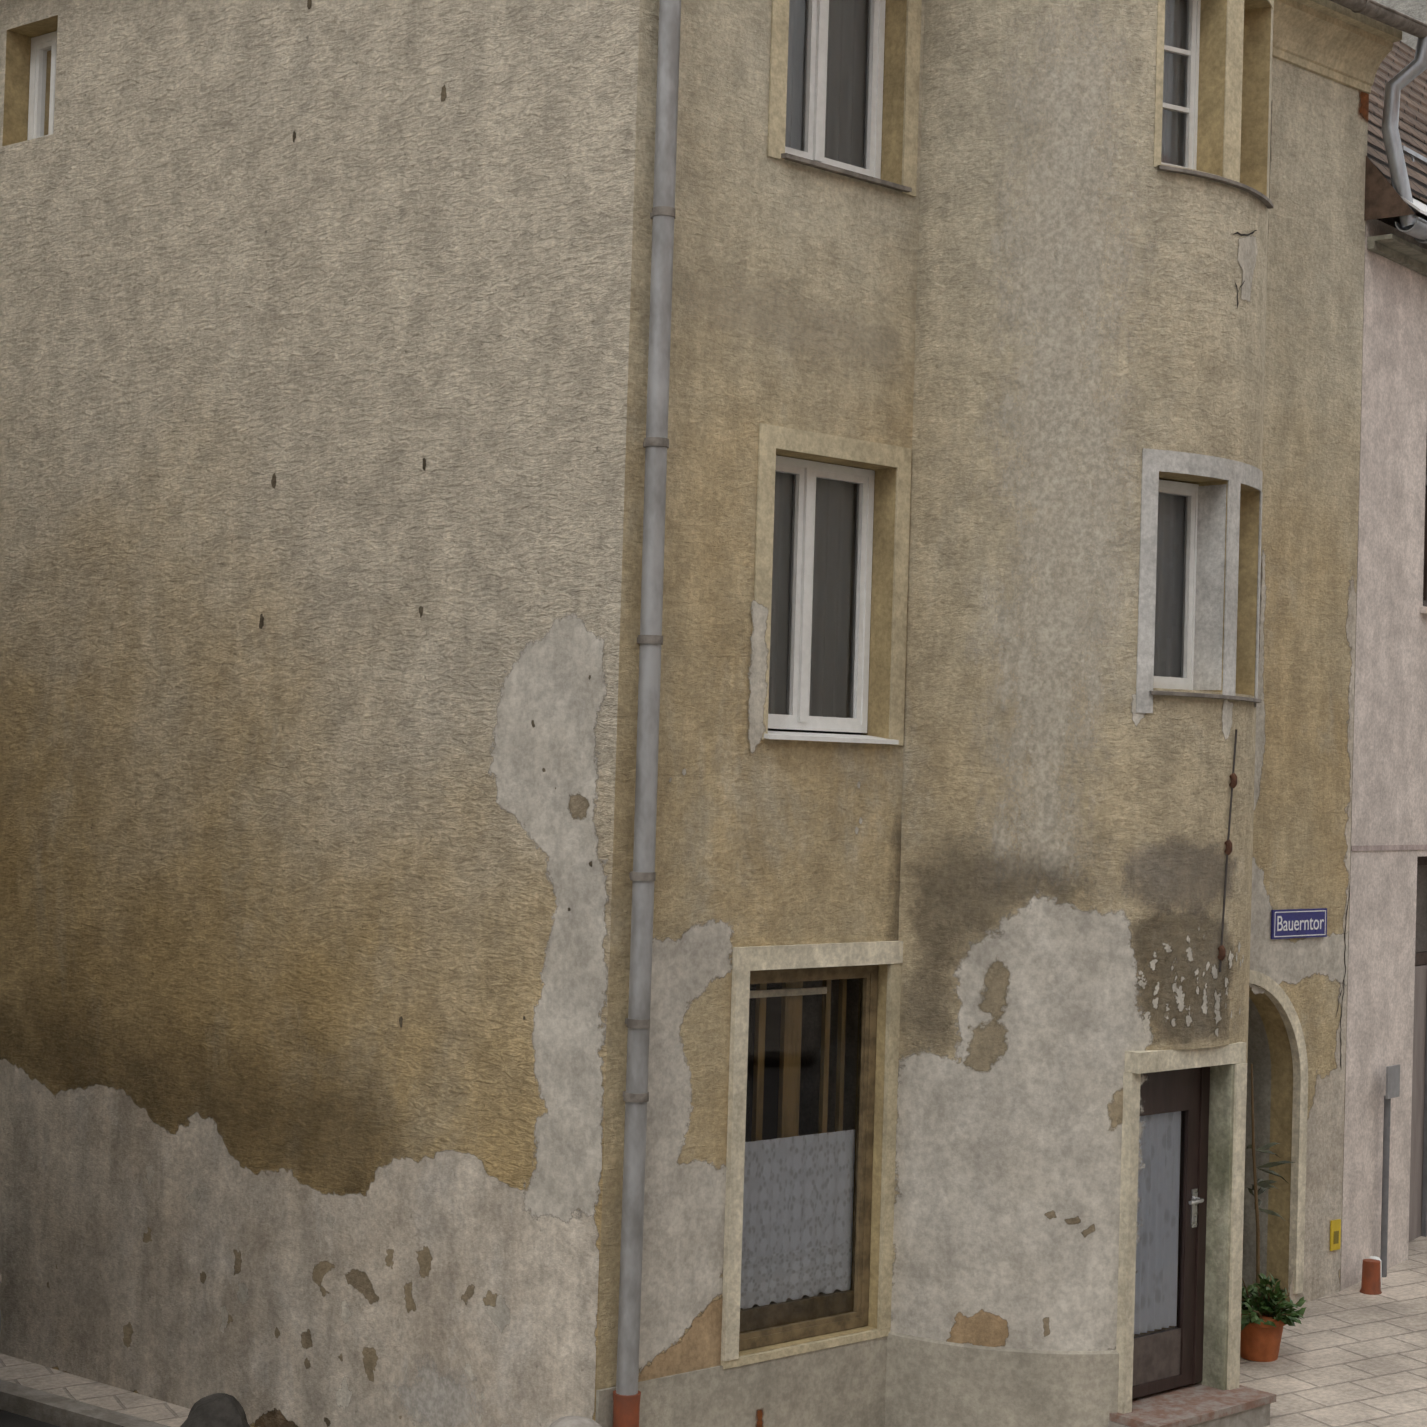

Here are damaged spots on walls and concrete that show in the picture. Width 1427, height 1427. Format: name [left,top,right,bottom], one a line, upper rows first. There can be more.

spalling [555,787,590,820]
peeling [1137,928,1244,1037]
flaking render [0,1059,599,1427]
peeling [638,1296,723,1382]